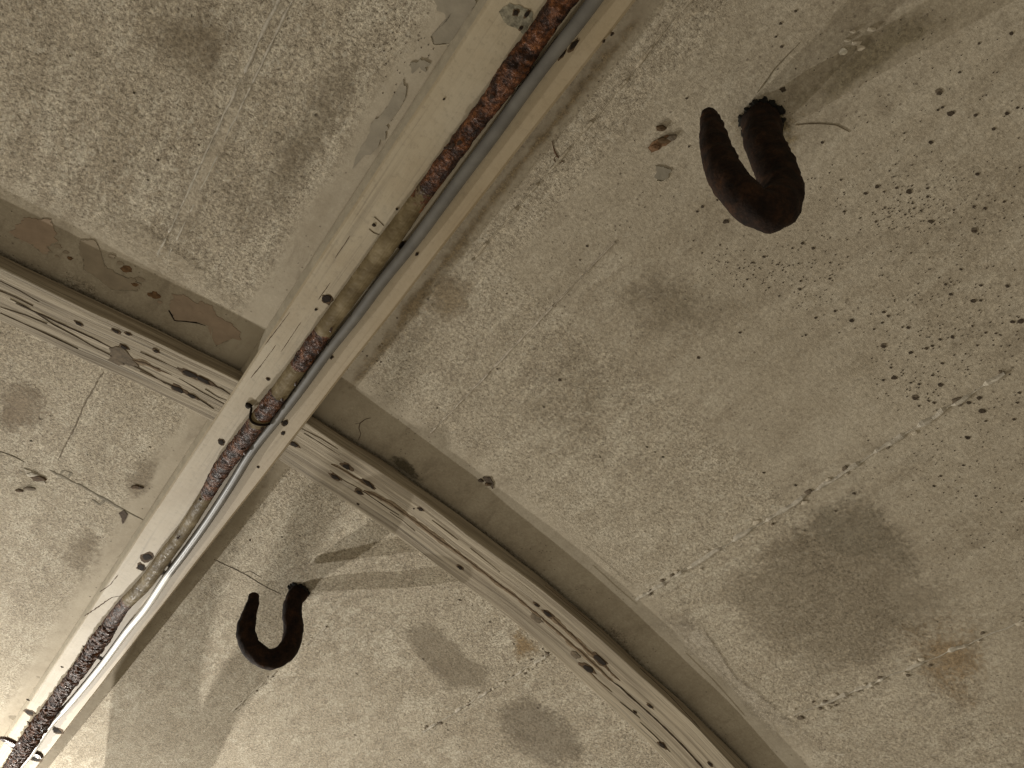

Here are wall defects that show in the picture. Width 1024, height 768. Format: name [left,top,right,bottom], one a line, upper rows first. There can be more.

peeling [352,0,476,169]
rust [397,26,633,327]
spalling [648,125,677,153]
peeling [9,211,241,347]
rust [9,657,88,767]